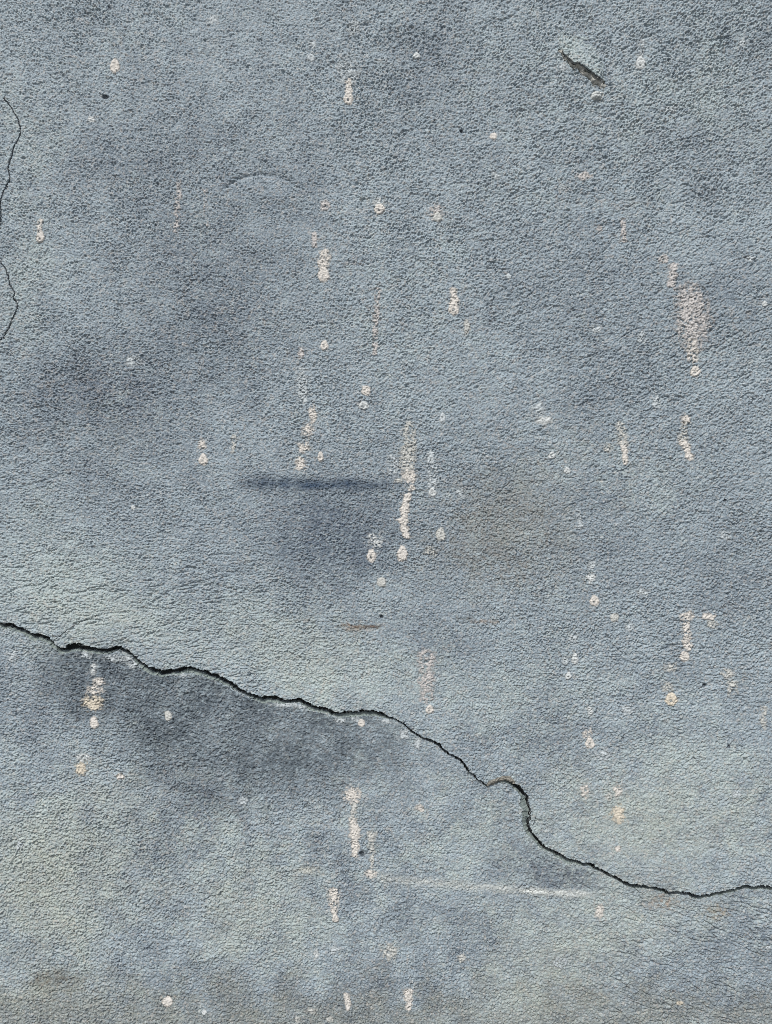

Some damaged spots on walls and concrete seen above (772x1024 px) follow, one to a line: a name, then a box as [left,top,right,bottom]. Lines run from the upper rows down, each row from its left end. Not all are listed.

crack [0,98,21,222]
crack [0,262,18,340]
crack [0,616,772,899]